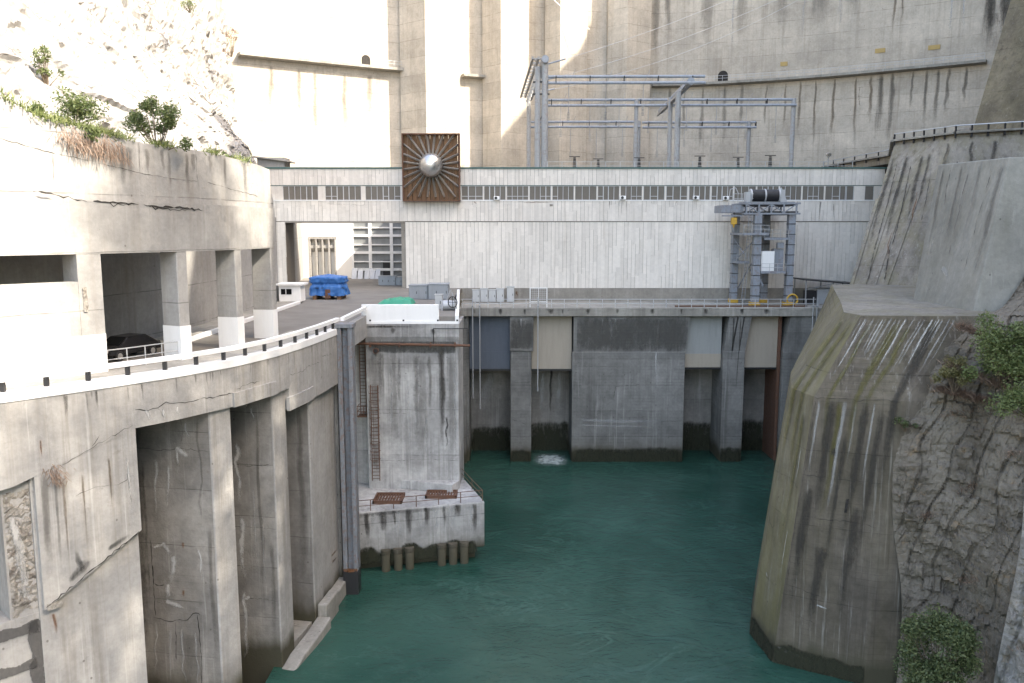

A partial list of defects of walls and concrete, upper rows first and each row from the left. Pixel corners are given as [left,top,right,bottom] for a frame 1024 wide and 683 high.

crack [1,138,256,211]
crack [63,381,258,465]
damp [368,325,455,440]
damp [782,321,938,594]
spalling [3,488,39,619]
damp [811,550,825,607]